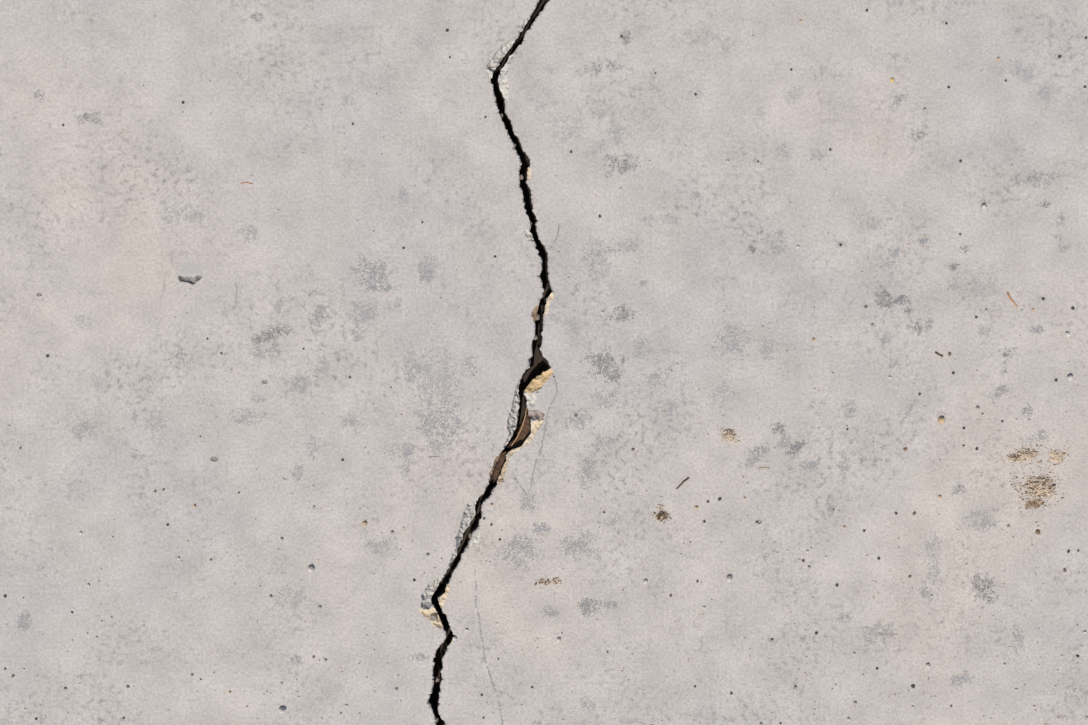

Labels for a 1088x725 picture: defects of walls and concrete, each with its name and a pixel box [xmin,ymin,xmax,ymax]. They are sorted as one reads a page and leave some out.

crack [428,0,559,725]